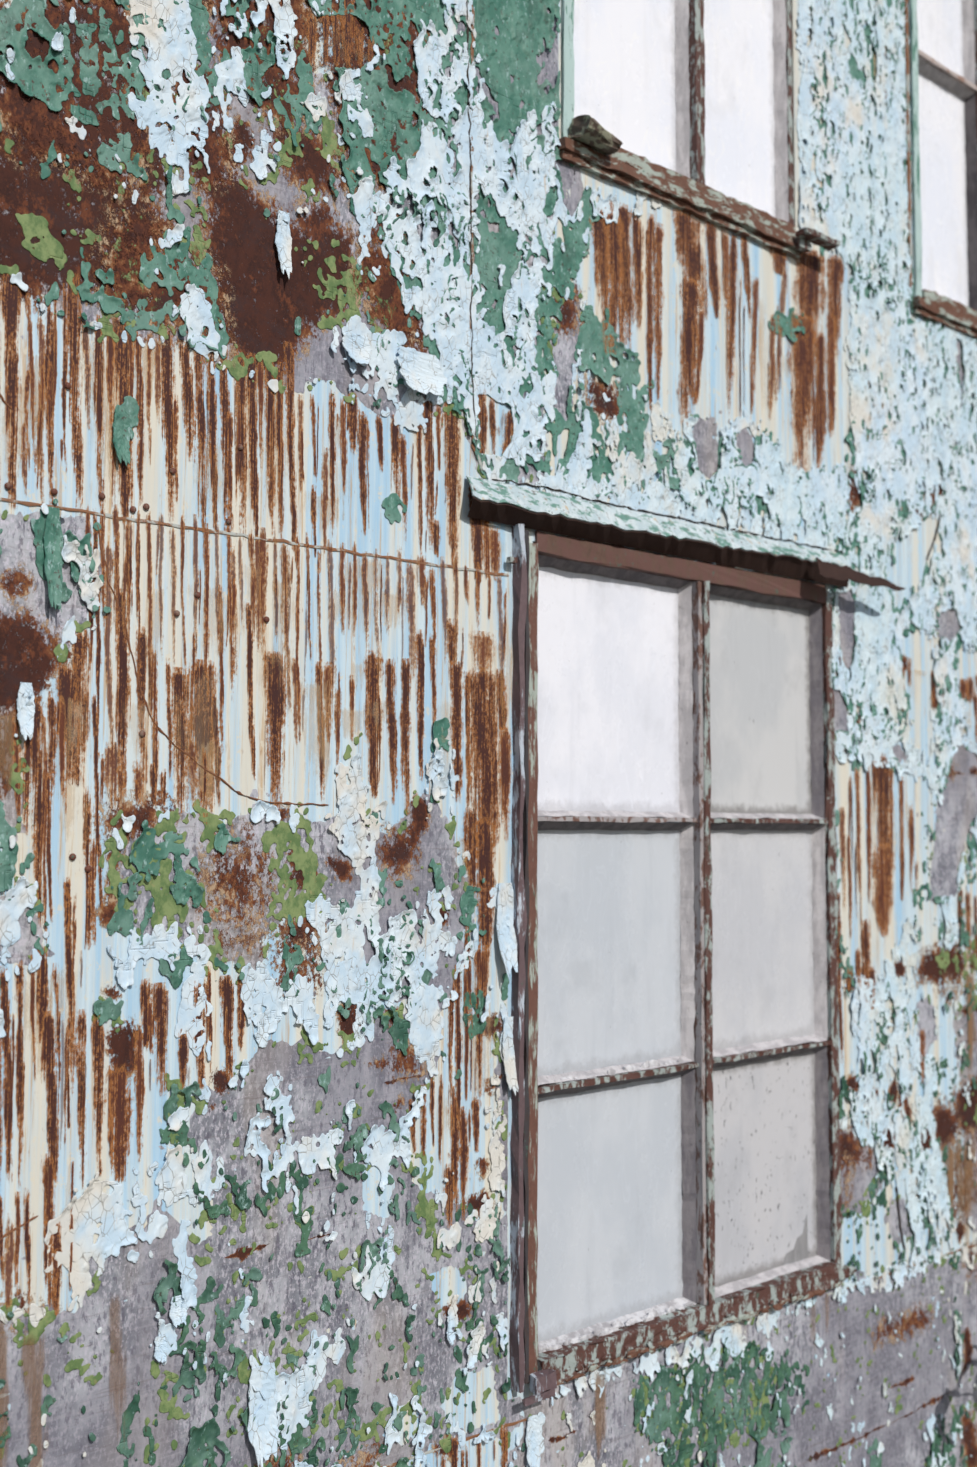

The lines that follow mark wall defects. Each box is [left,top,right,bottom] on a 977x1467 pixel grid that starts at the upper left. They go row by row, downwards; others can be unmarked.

rust [552,201,845,470]
rust [0,0,514,1334]
peeling [0,0,977,1111]
rust [902,654,913,687]
peeling [0,717,977,1467]
rust [836,753,977,1287]
rust [431,1423,508,1467]
rust [957,1409,977,1467]
rust [961,1327,974,1377]